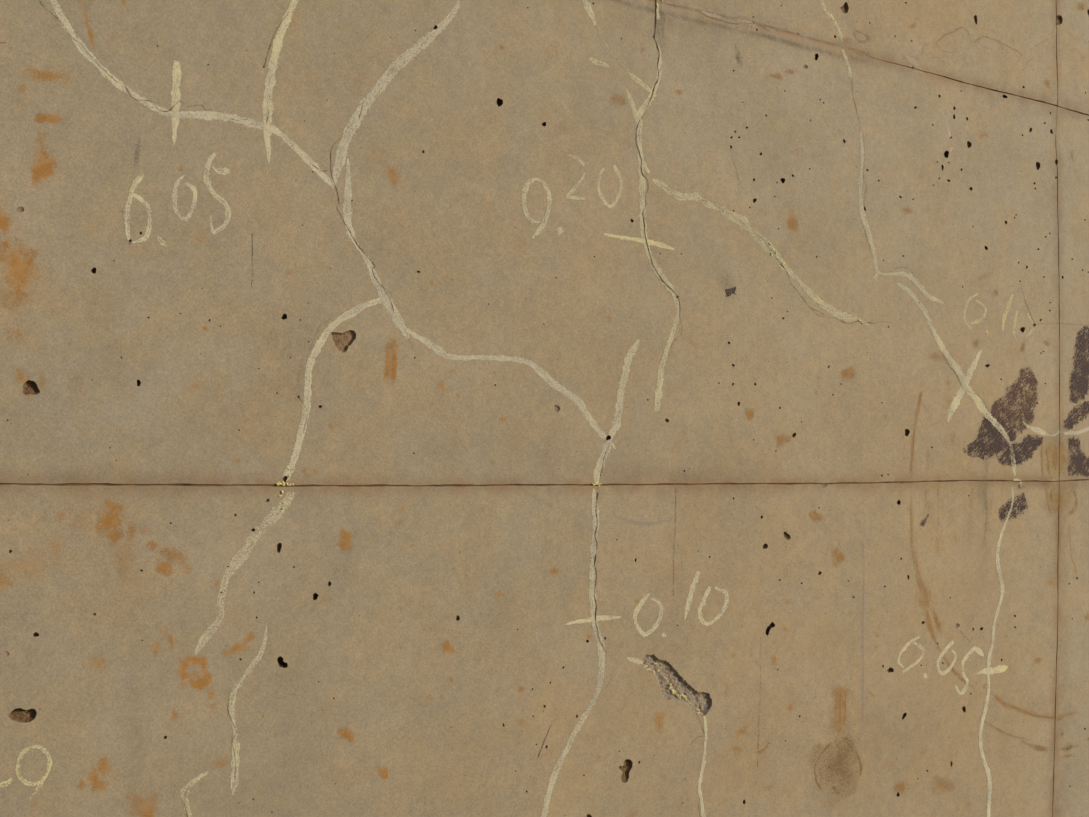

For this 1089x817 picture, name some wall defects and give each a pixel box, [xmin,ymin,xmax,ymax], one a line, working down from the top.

crack [636,0,683,348]
rust [0,204,52,311]
rust [68,497,194,586]
rust [177,655,218,710]